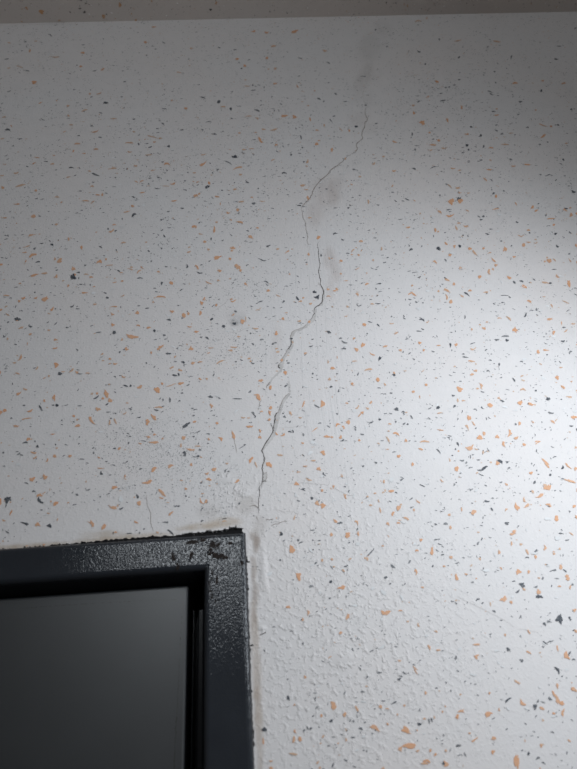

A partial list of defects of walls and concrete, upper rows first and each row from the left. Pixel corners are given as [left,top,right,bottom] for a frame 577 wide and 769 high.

crack [252,77,369,525]